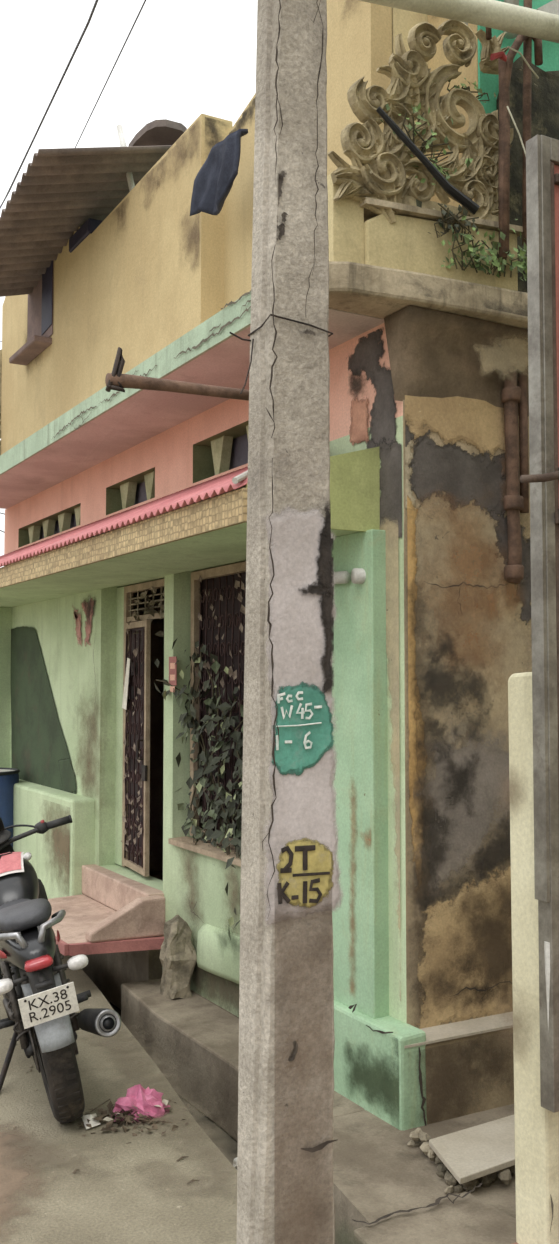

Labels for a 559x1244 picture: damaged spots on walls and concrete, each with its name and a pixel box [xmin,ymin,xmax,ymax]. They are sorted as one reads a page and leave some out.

leakage [177,98,255,157]
leakage [188,223,199,257]
crack [262,247,279,919]
peeling [348,329,532,1029]
leakage [420,636,484,737]
leakage [417,721,477,805]
leakage [416,781,511,936]
leakage [417,891,512,1000]
crack [352,1183,482,1225]